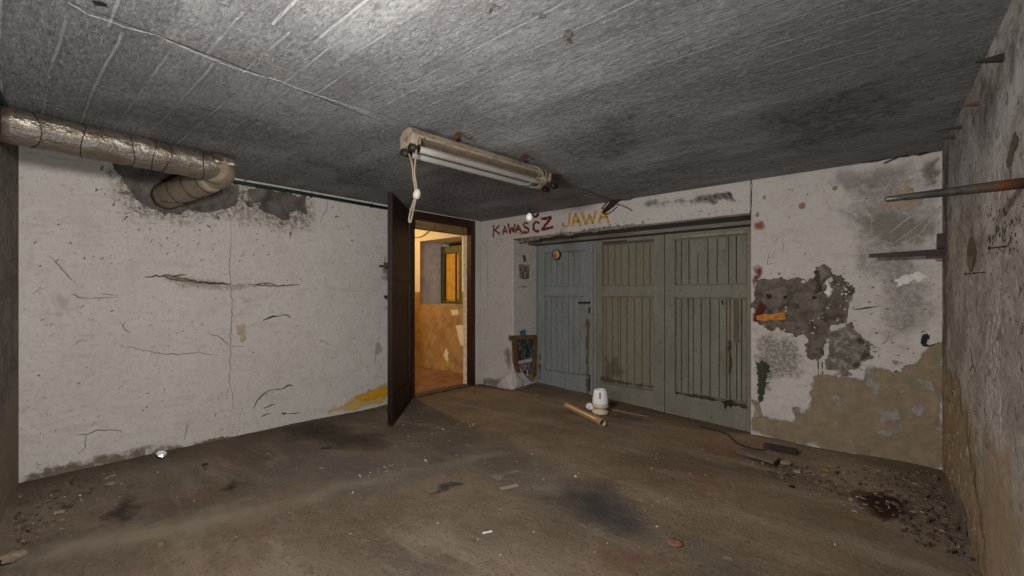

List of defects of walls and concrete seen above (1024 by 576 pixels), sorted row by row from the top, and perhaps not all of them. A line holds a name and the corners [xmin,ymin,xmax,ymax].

flaking render [95,163,308,263]
crack [121,218,300,417]
damp [329,385,388,413]
peeling [749,259,985,572]